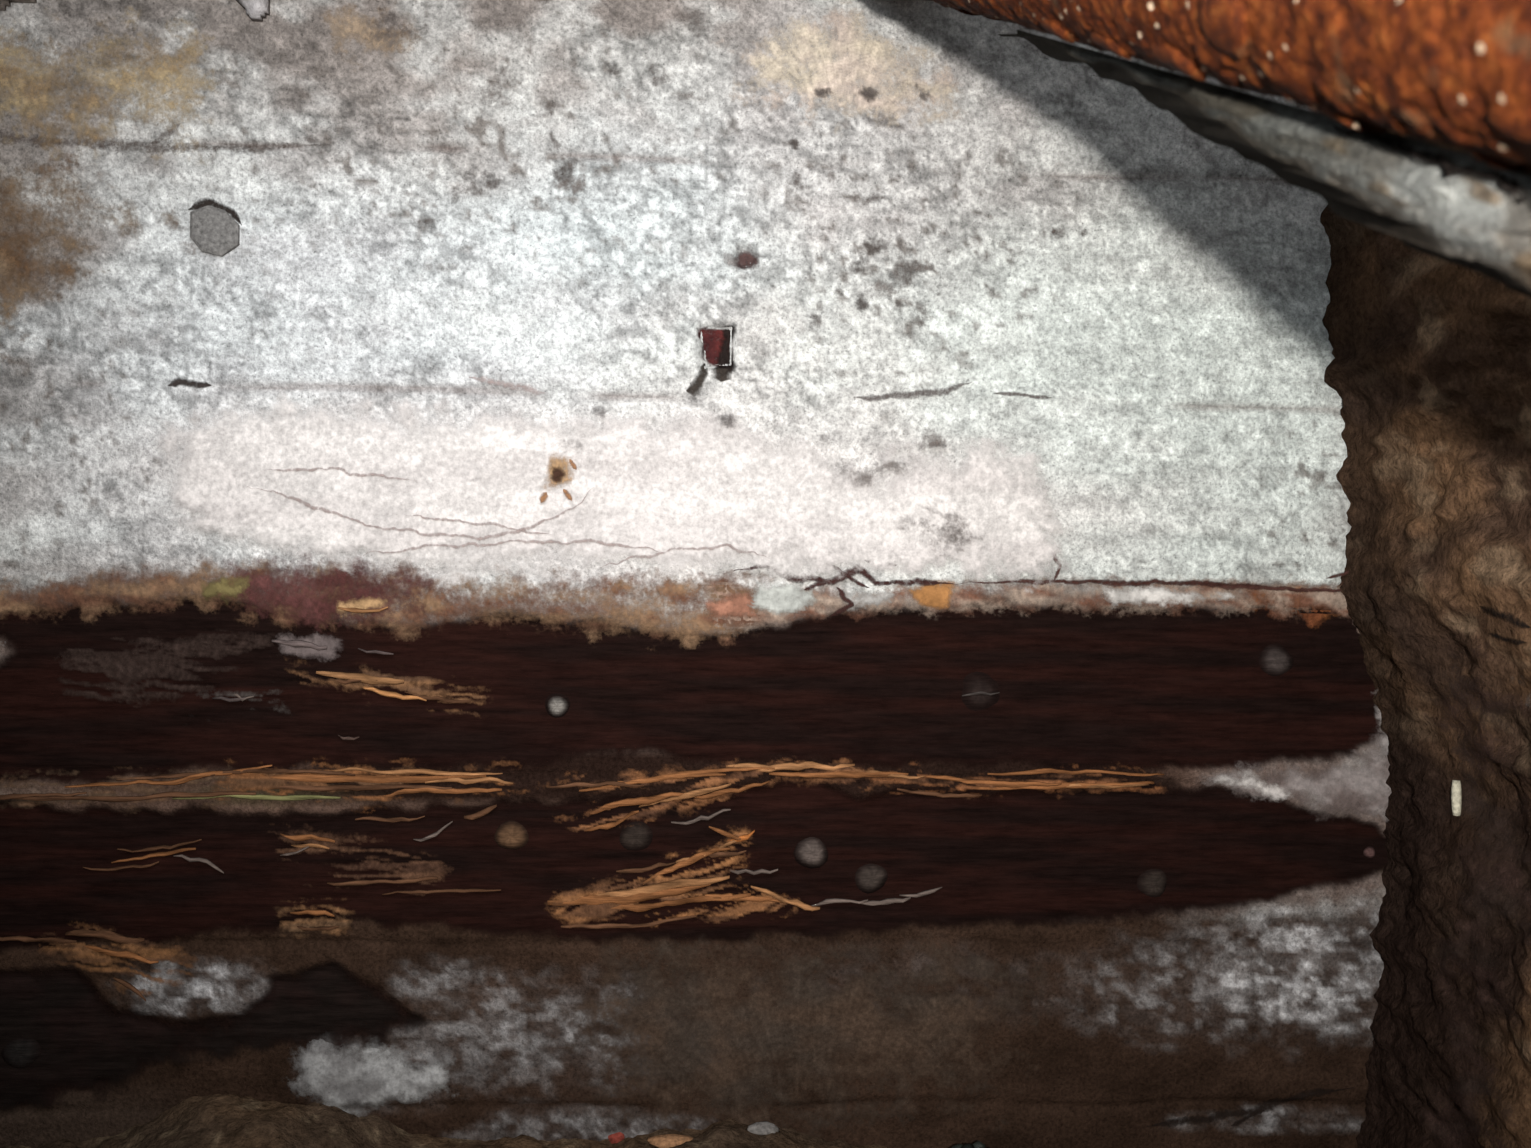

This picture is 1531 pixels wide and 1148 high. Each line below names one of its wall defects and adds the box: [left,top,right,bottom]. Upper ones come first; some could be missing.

water stain [0,37,214,142]
rust [1040,19,1133,60]
rust [1149,42,1208,82]
rust [1316,105,1390,134]
rust [1462,106,1531,174]
water stain [0,158,88,324]
crack [734,554,1349,617]
water stain [573,940,1026,1129]